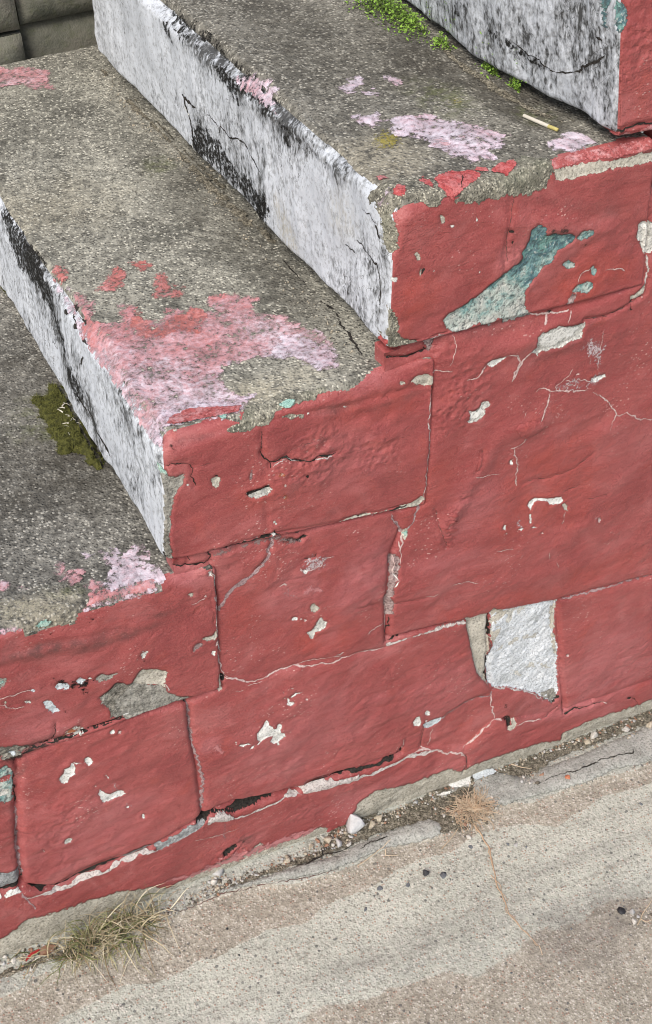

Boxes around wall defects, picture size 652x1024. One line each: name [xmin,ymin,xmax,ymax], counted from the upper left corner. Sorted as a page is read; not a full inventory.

peeling [351,112,652,253]
peeling [378,225,597,350]
peeling [52,260,339,447]
crack [260,431,336,468]
crack [593,392,652,430]
spalling [43,669,189,734]
crack [163,521,308,617]
crack [221,505,477,692]
flaking render [465,575,648,703]
crack [0,686,641,899]
peeling [0,827,327,957]
crack [180,836,387,912]